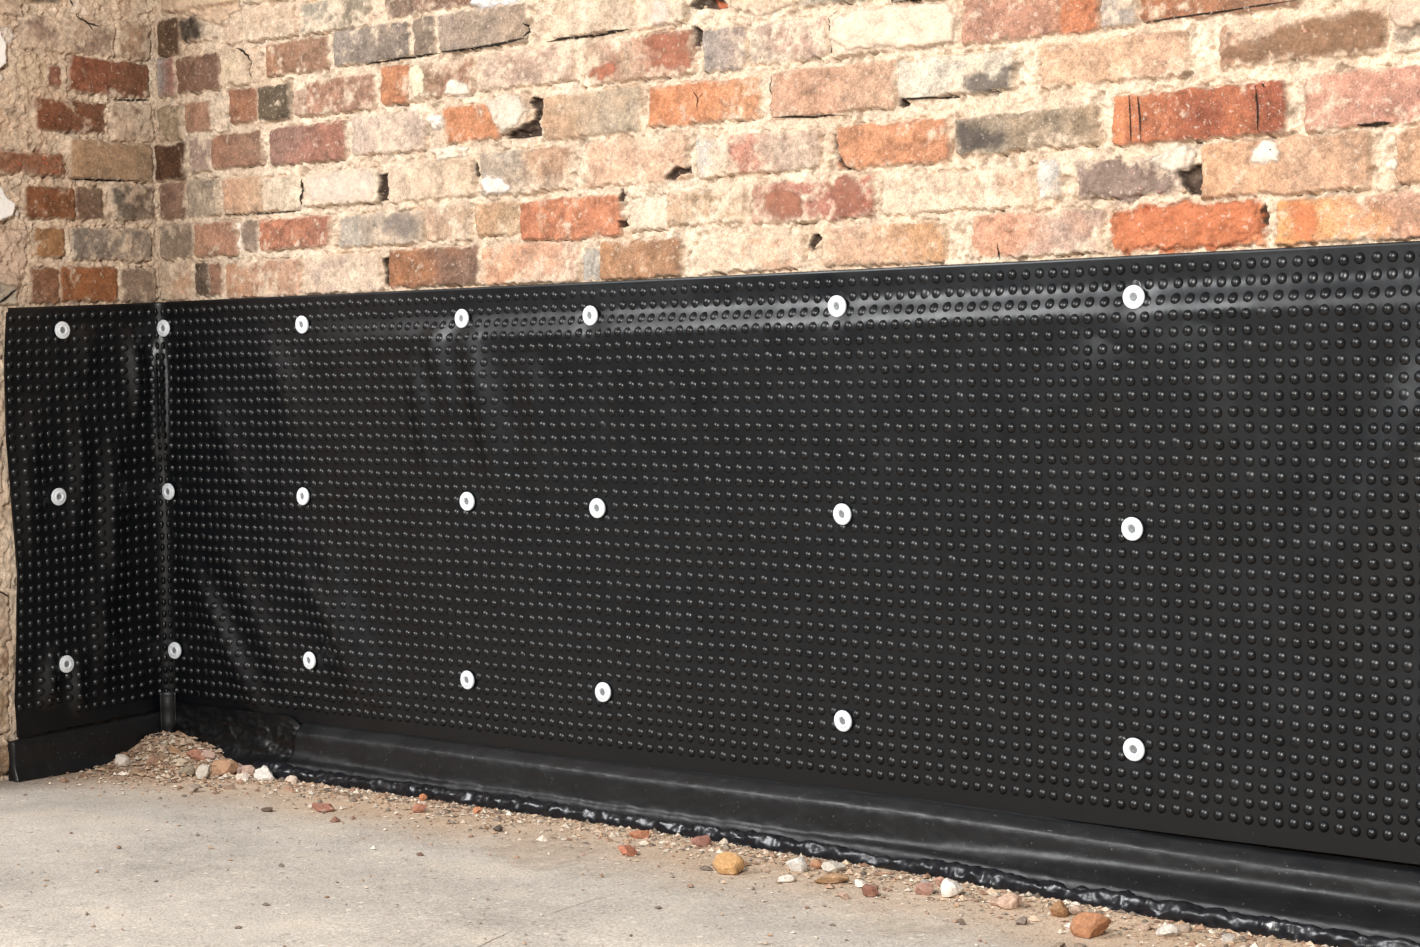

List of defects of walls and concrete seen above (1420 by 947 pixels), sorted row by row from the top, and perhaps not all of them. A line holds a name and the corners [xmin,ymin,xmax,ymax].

spalling [0,150,65,221]